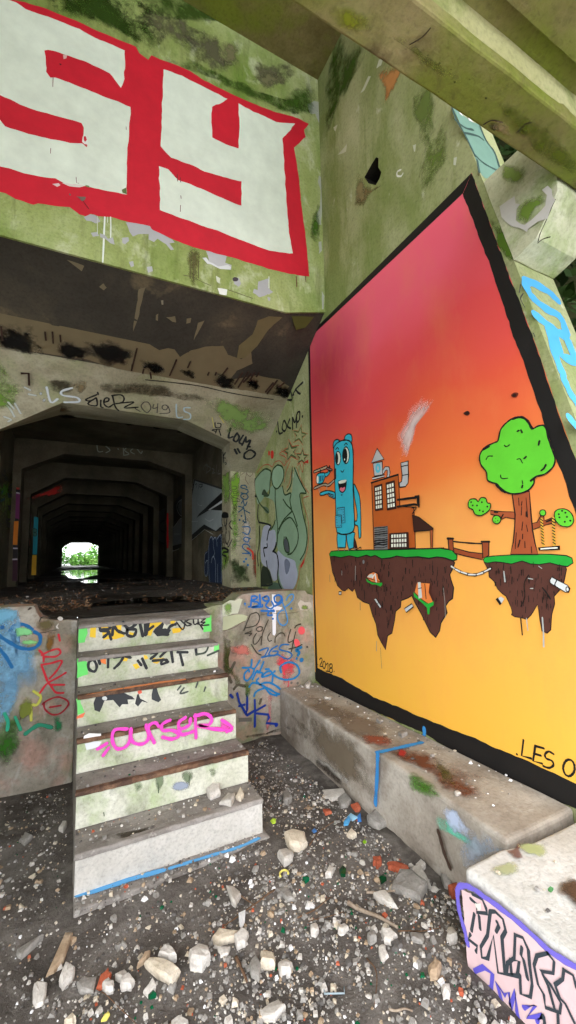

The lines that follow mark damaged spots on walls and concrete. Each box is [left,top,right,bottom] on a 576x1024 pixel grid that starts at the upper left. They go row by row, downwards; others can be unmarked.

peeling [203,251,241,295]
peeling [253,278,272,301]
water stain [51,380,86,393]
water stain [104,384,200,400]